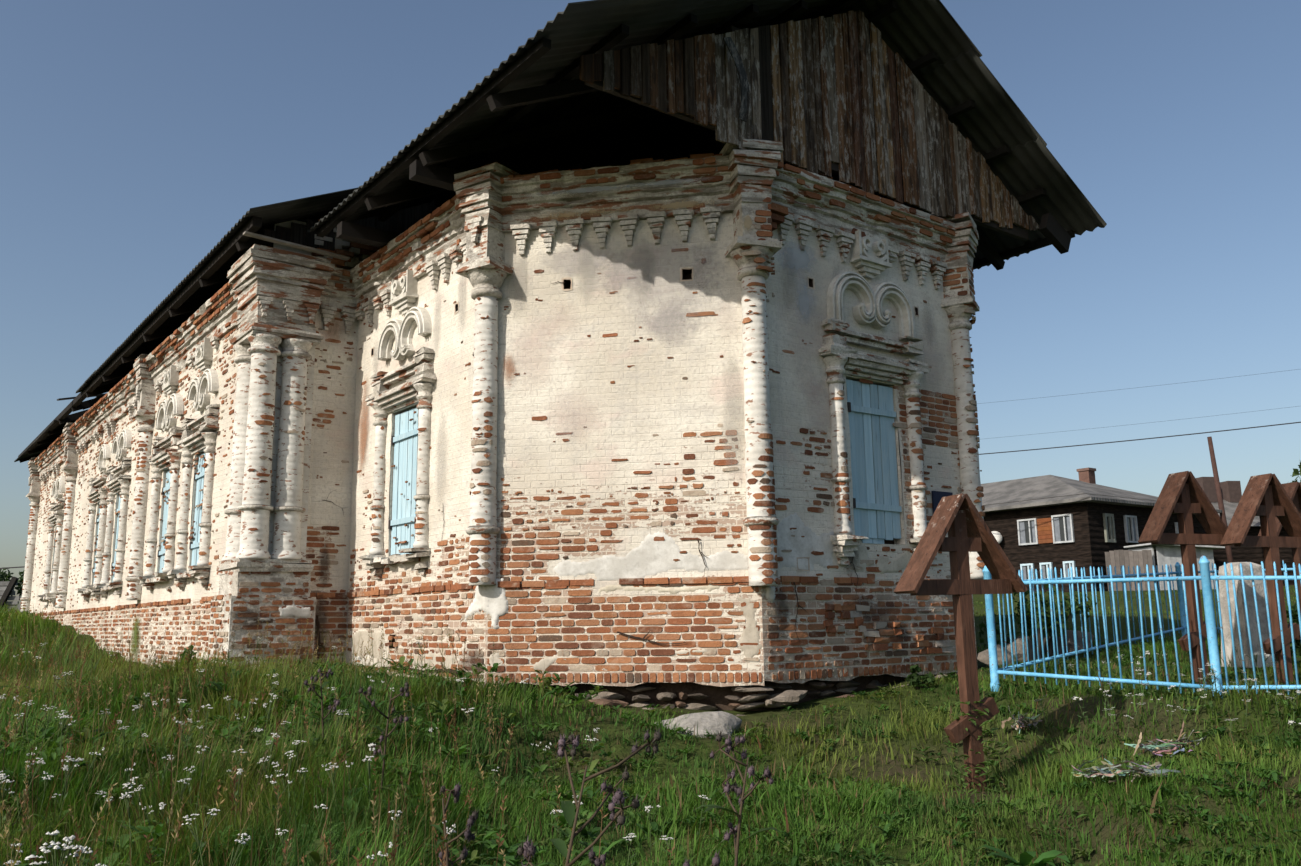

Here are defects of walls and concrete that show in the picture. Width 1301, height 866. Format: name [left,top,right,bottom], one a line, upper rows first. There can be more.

flaking render [540,167,656,189]
flaking render [330,199,461,307]
spalling [671,248,706,294]
spalling [740,162,956,323]
flaking render [20,257,985,683]